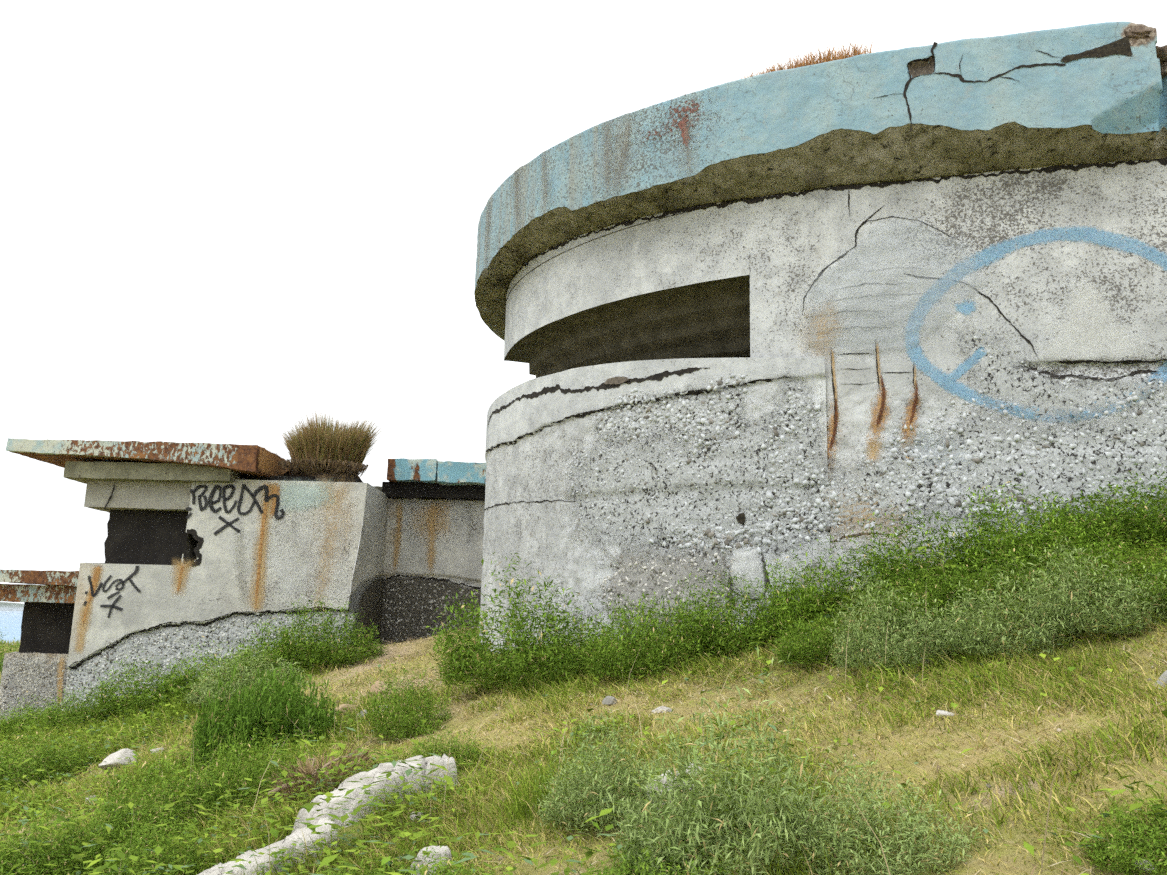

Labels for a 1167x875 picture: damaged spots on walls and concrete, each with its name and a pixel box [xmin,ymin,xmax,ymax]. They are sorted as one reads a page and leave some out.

corrosion [635,88,711,146]
crack [875,42,1066,132]
spalling [1061,27,1167,79]
crack [506,157,1167,314]
crack [904,273,1167,381]
crack [486,367,793,452]
corrosion [827,352,838,473]
corrosion [869,346,889,464]
corrosion [902,362,919,459]
hole [186,529,204,567]
corrosion [252,446,289,610]
spalling [0,611,355,720]